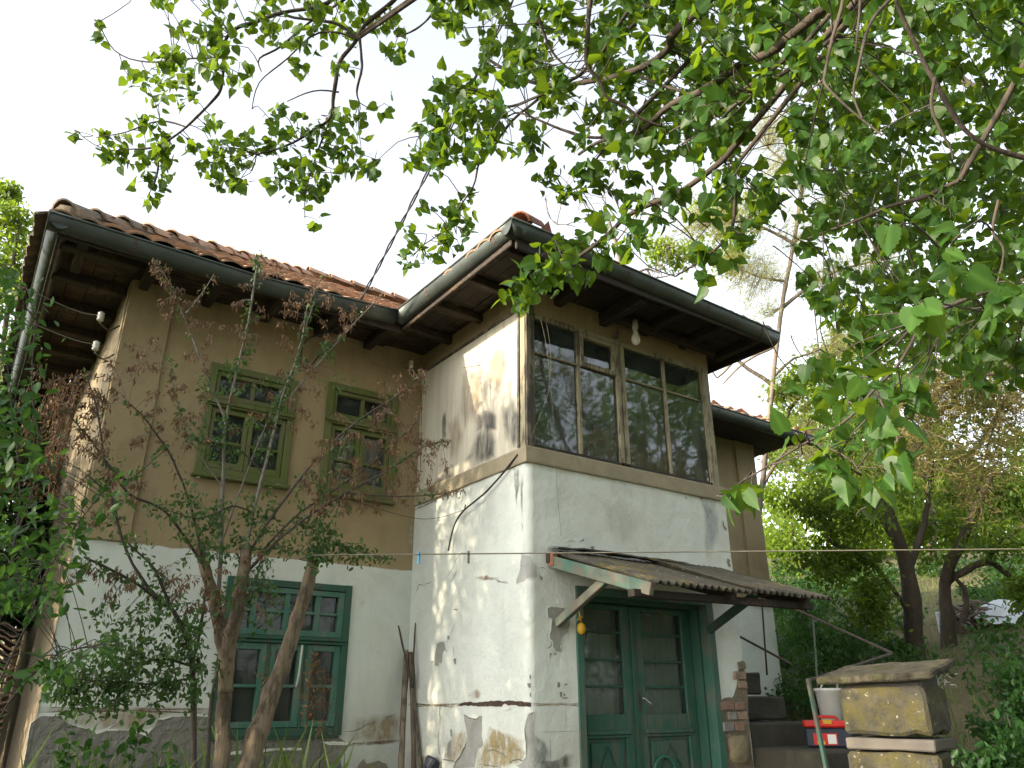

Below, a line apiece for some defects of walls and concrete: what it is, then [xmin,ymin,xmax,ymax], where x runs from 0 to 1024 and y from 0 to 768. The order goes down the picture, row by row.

leakage [466,376,516,460]
flaking render [516,549,544,585]
flaking render [431,626,457,667]
flaking render [547,606,570,658]
flaking render [453,713,484,768]
flaking render [517,710,542,768]